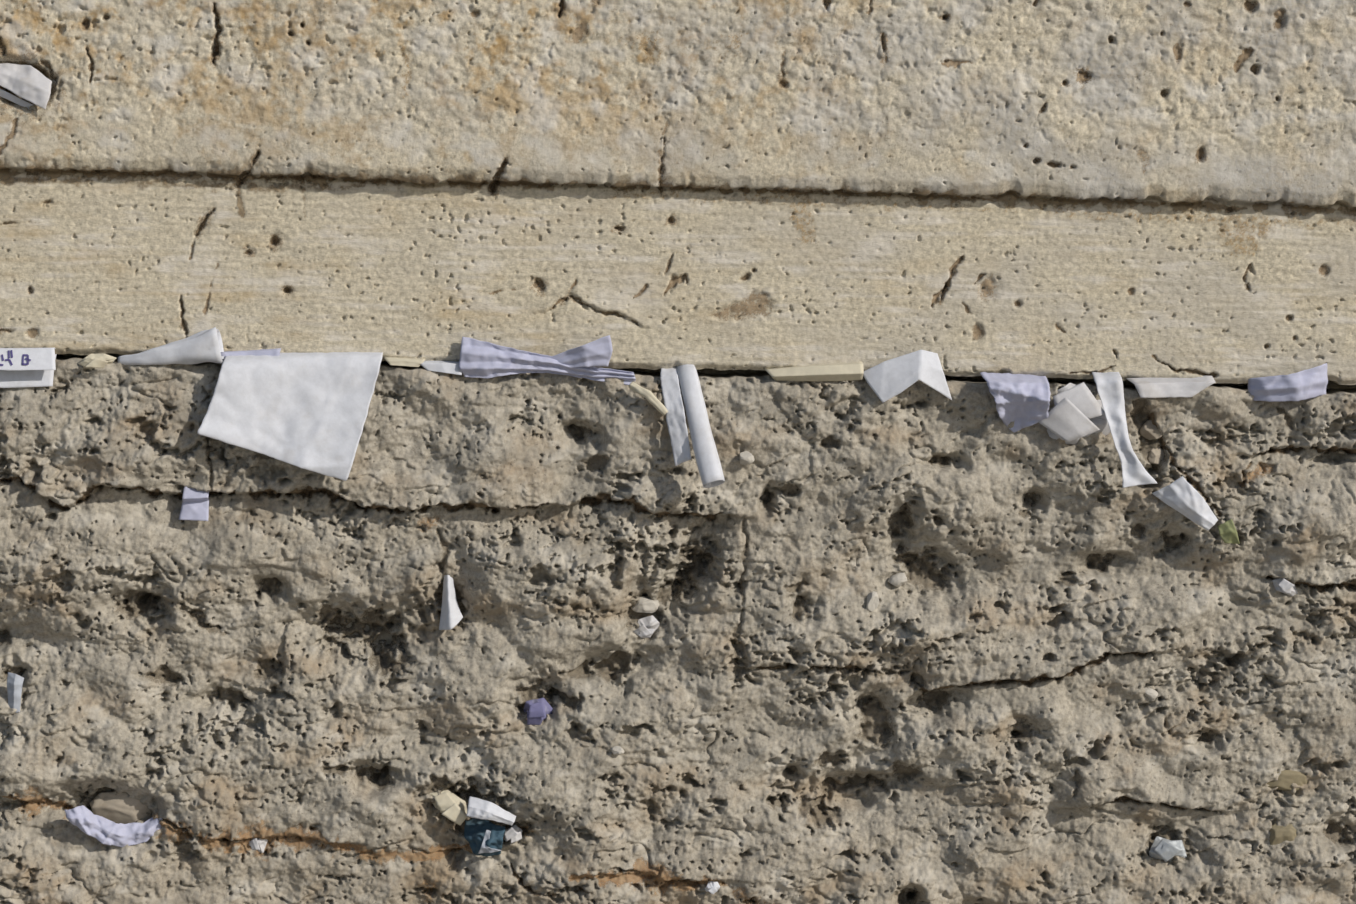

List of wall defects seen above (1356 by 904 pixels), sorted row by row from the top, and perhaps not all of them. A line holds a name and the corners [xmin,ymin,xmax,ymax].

crack [0,437,1149,692]
crack [1199,637,1270,692]
corrosion [2,787,71,821]
corrosion [152,814,472,864]